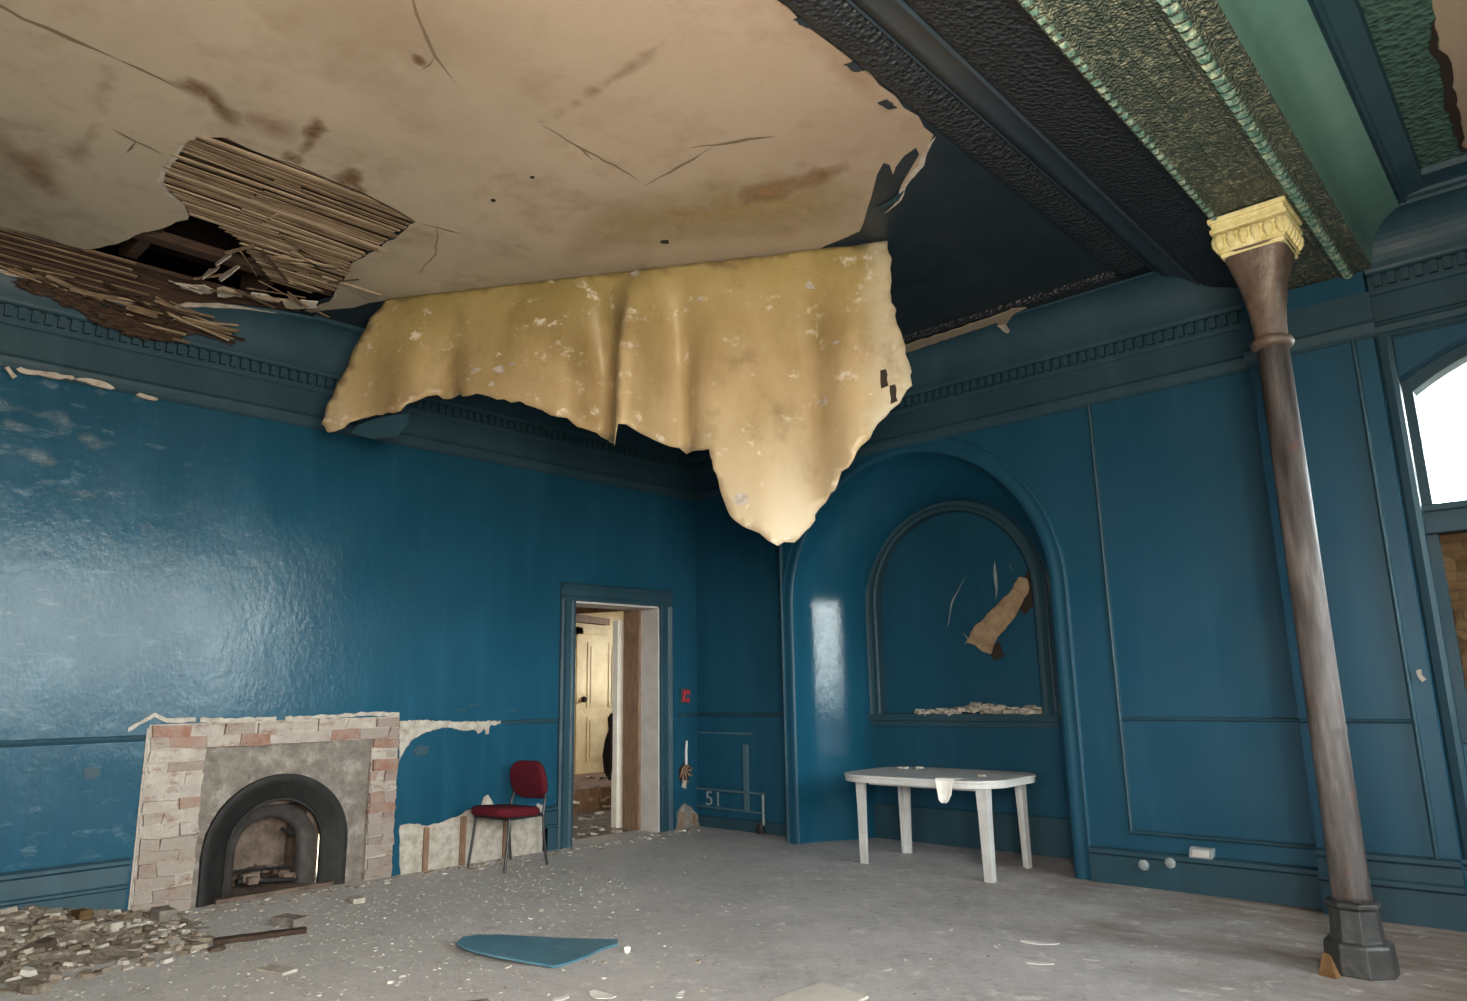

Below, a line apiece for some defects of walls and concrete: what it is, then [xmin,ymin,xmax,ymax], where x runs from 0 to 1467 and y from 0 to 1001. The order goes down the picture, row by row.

flaking render [1429,0,1467,153]
flaking render [0,0,1026,546]
peeling [399,795,548,875]